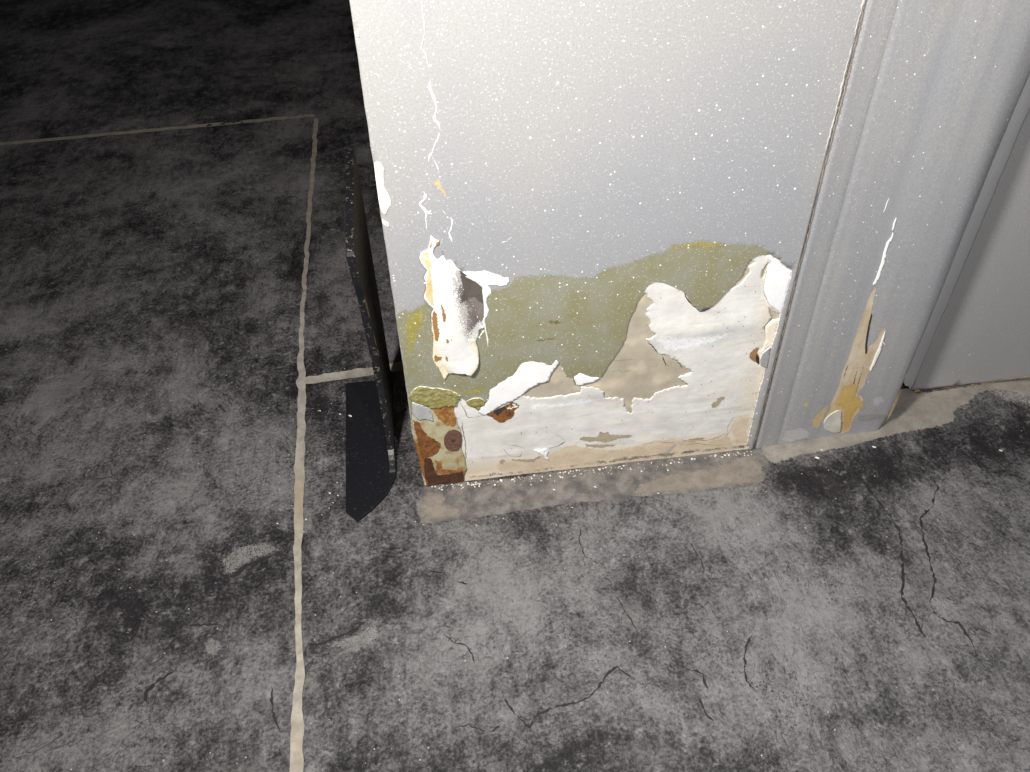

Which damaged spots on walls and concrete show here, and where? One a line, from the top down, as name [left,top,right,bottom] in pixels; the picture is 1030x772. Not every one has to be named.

spalling [374,162,391,227]
peeling [420,235,509,380]
water stain [396,239,772,413]
flaking render [454,255,792,481]
peeling [412,402,434,422]
corrosion [413,420,464,487]
corrosion [432,407,456,427]
water stain [812,383,864,431]
crack [825,199,977,655]